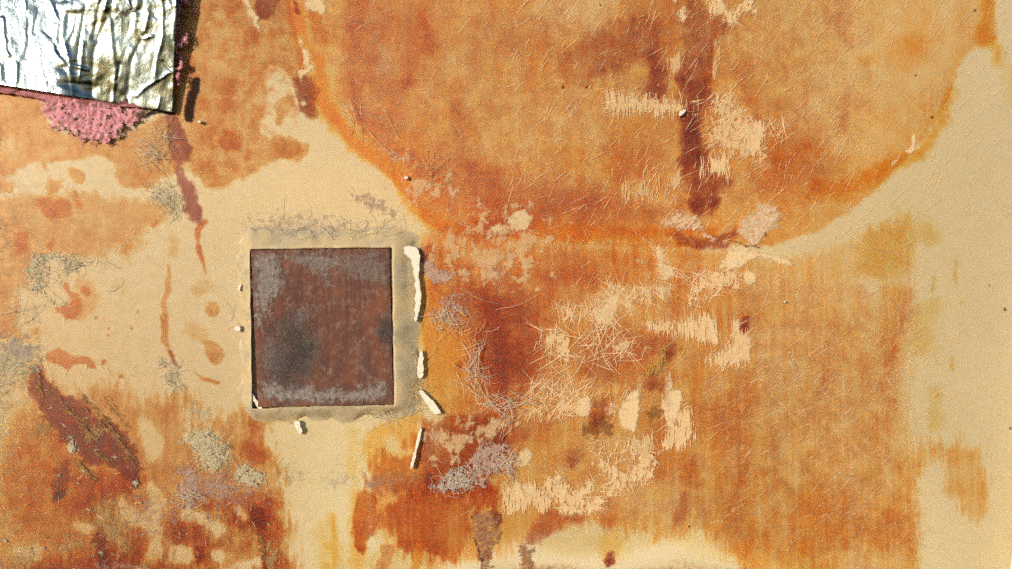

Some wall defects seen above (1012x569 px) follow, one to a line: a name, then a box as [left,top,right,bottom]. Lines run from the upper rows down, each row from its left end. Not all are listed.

spalling [659,203,783,248]
peeling [403,246,421,322]
peeling [417,351,441,414]